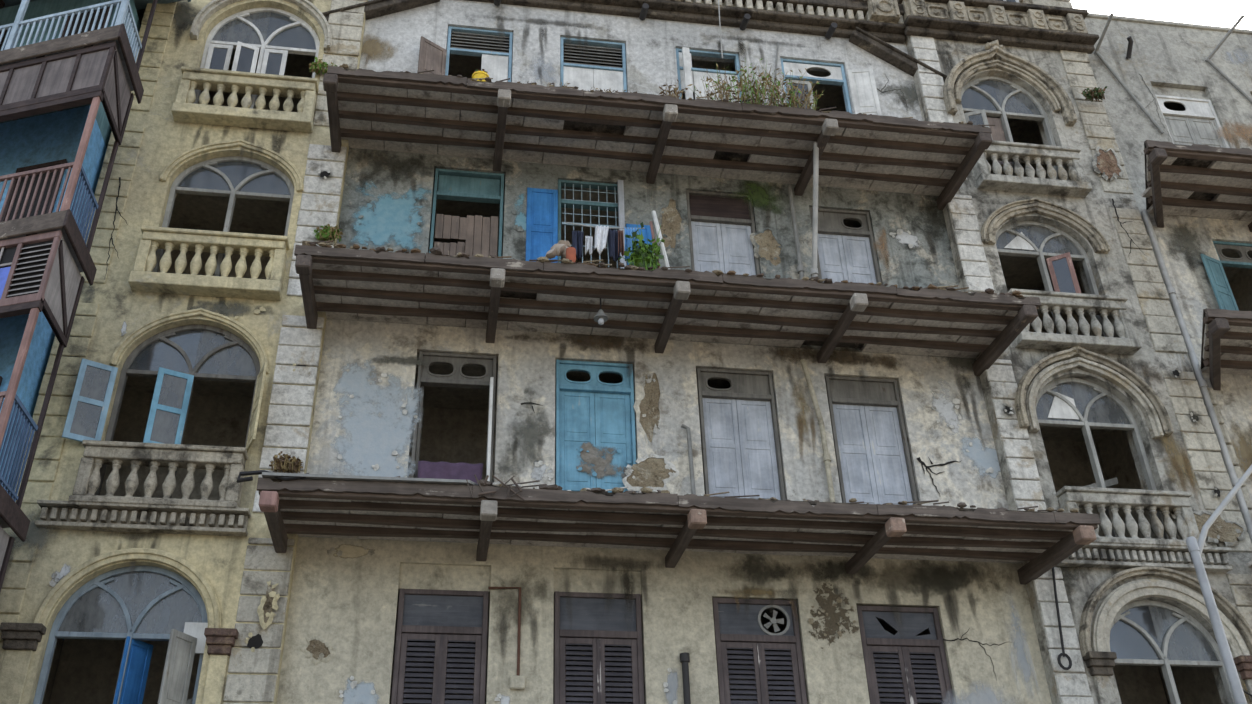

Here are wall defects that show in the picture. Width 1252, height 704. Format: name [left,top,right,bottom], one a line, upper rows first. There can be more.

spalling [1092,147,1124,181]
damp [500,388,550,472]
spalling [576,370,679,492]
crack [917,457,961,495]
damp [735,556,794,603]
peeling [808,583,859,649]
damp [806,560,984,620]
crack [943,628,1006,681]